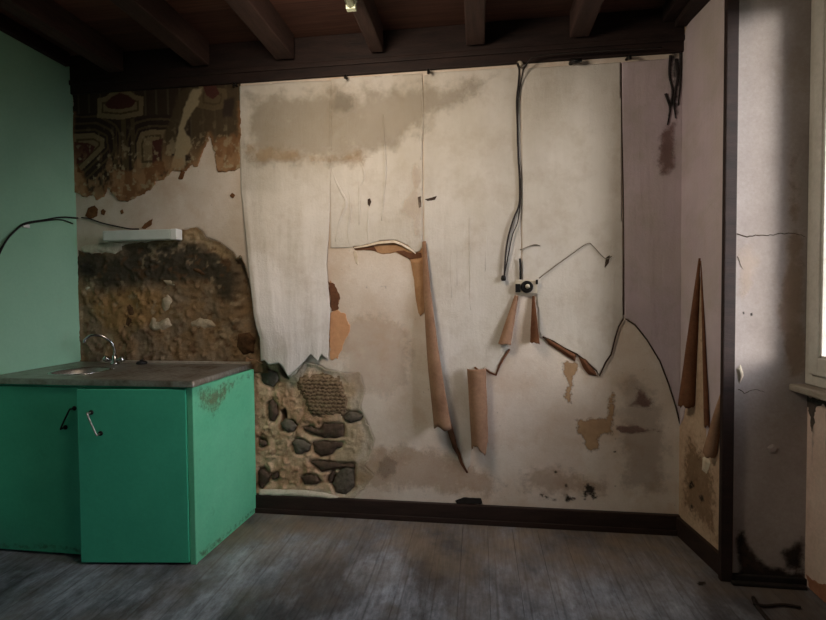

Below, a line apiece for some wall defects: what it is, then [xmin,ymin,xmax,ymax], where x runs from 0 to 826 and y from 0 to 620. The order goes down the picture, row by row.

spalling [78,227,374,498]
water stain [565,484,597,501]
water stain [736,532,805,578]